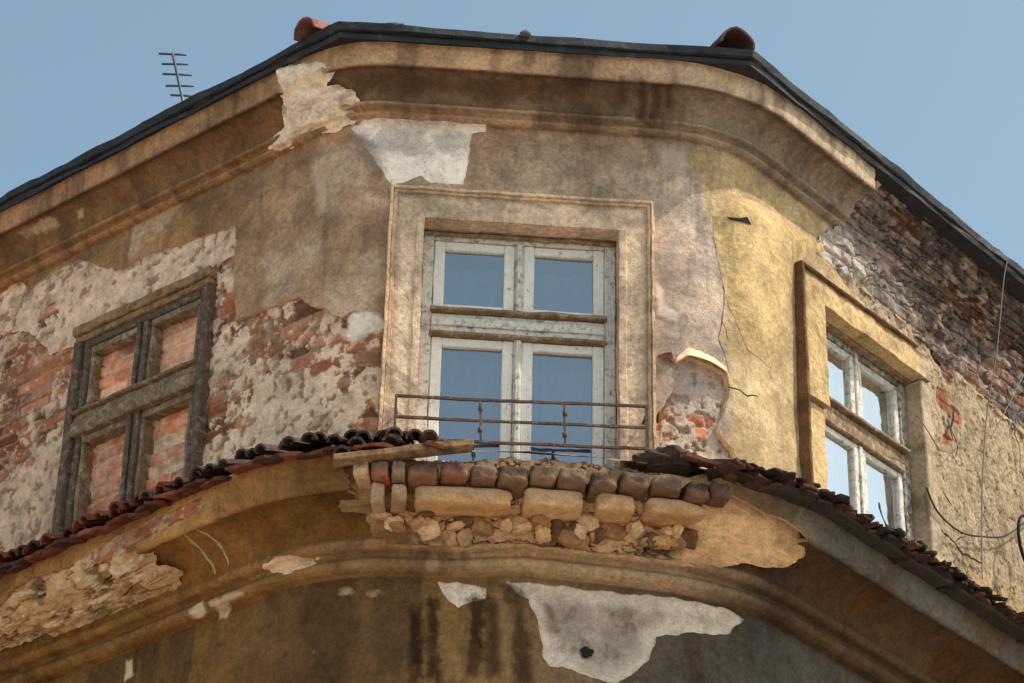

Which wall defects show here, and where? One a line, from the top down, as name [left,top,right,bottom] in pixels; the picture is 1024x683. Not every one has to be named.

flaking render [350,118,487,185]
spalling [0,225,384,552]
spalling [344,348,811,545]
crack [719,286,759,397]
spalling [817,242,1024,613]
spalling [0,496,204,606]
flaking render [438,581,487,608]
damp [410,584,532,683]
flaking render [506,581,744,683]